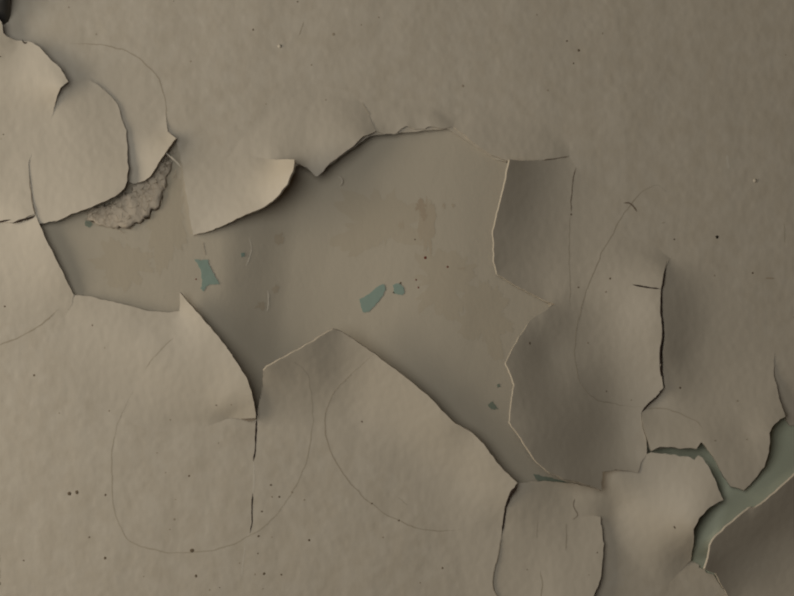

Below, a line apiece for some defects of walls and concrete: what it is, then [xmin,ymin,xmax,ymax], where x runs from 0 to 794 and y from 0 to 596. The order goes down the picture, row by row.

crack [111,354,460,553]
flaking render [0,21,604,596]
peeling [492,157,670,305]
crack [545,156,701,426]
peeling [505,249,794,596]